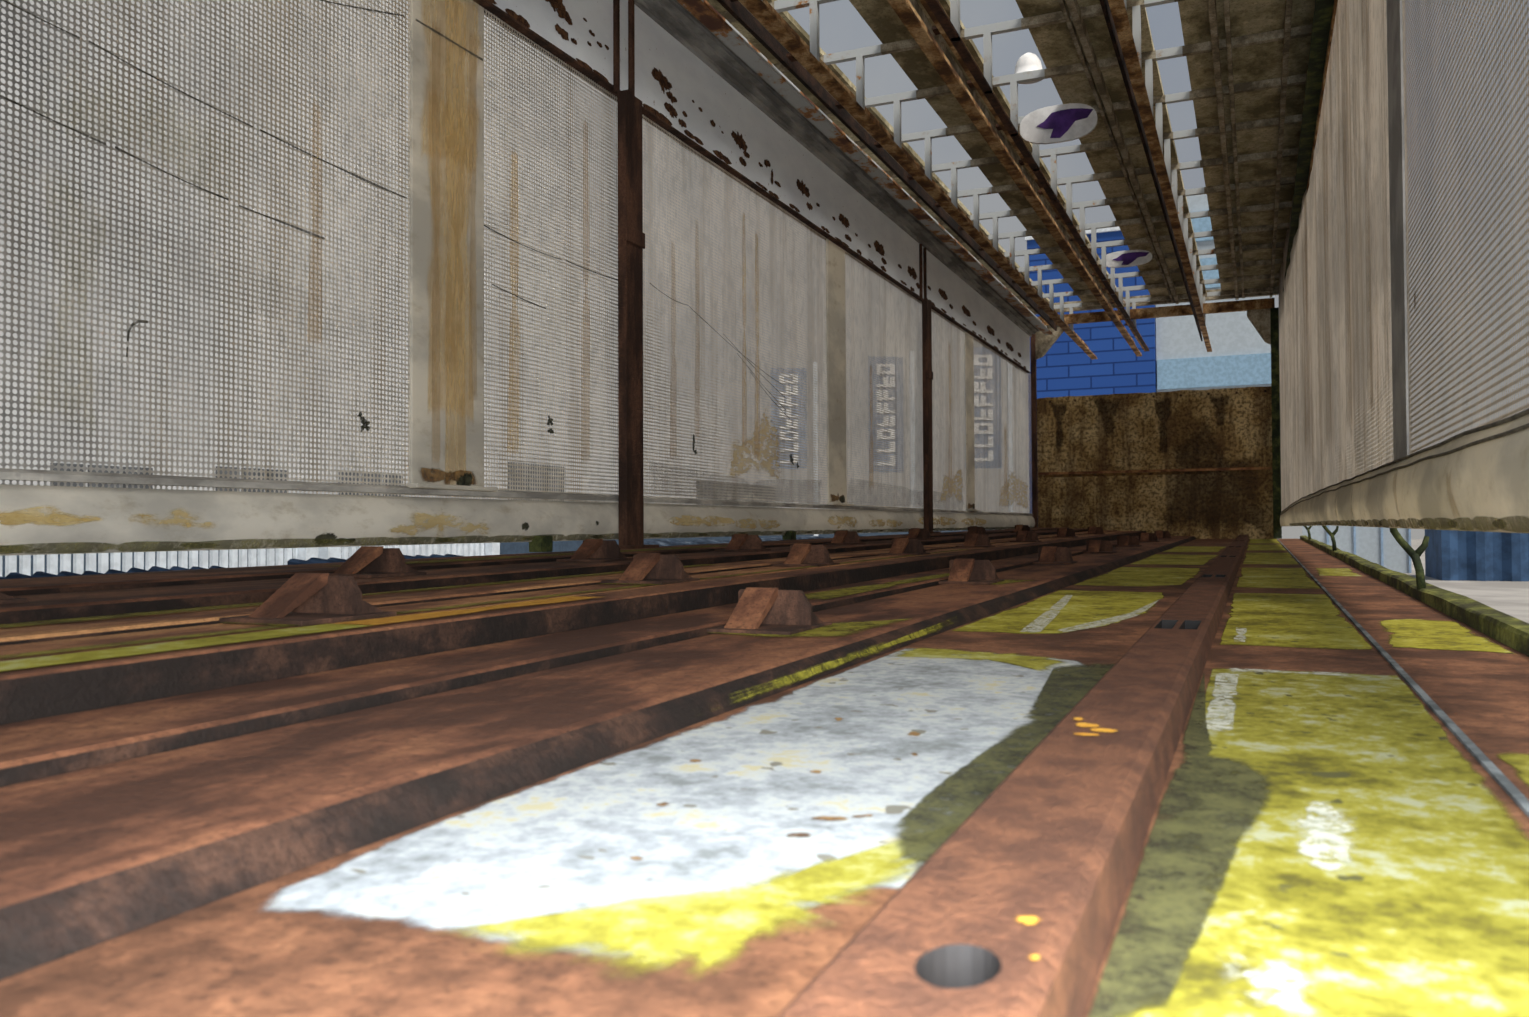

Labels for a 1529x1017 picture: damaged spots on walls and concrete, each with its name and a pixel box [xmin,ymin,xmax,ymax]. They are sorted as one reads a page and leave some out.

rust [488,0,530,28]
peeling [545,0,609,50]
rust [642,104,732,164]
peeling [651,67,1021,357]